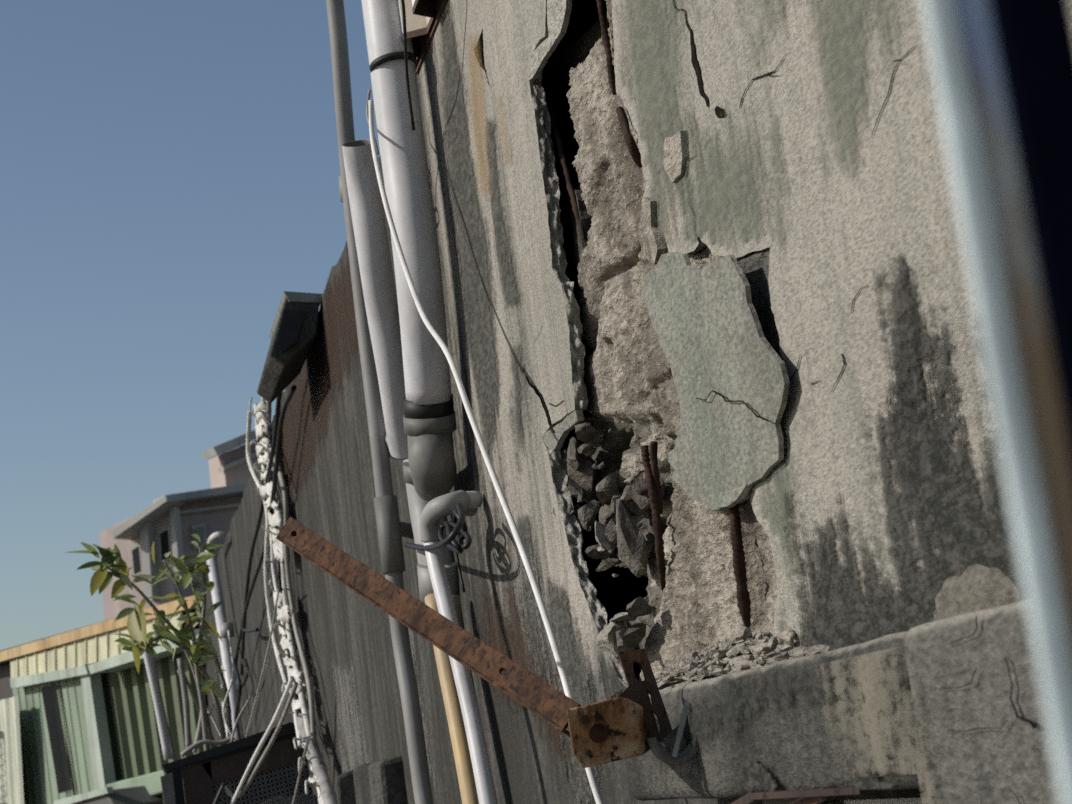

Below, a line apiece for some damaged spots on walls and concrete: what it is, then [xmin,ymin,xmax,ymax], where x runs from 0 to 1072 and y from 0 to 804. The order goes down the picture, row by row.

crack [673,1,786,118]
crack [871,45,915,137]
spalling [528,0,790,693]
damp [652,254,1026,764]
crack [948,657,1039,732]